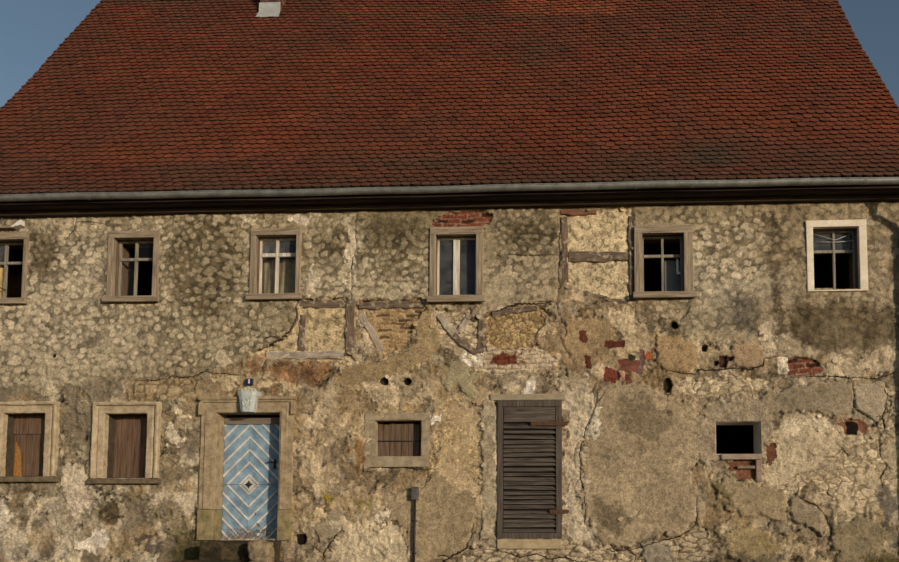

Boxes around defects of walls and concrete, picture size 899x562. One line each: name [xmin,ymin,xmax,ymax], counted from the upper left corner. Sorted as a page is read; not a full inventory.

crack [253,218,371,353]
flaking render [256,210,558,396]
flaking render [559,207,655,385]
crack [132,371,241,397]
flaking render [663,356,773,398]
flaking render [727,307,899,530]
flaking render [463,355,646,562]
water stain [10,487,35,524]
water stain [97,484,133,525]
water stain [135,532,162,554]
flaking render [660,526,710,562]
crack [792,486,832,546]